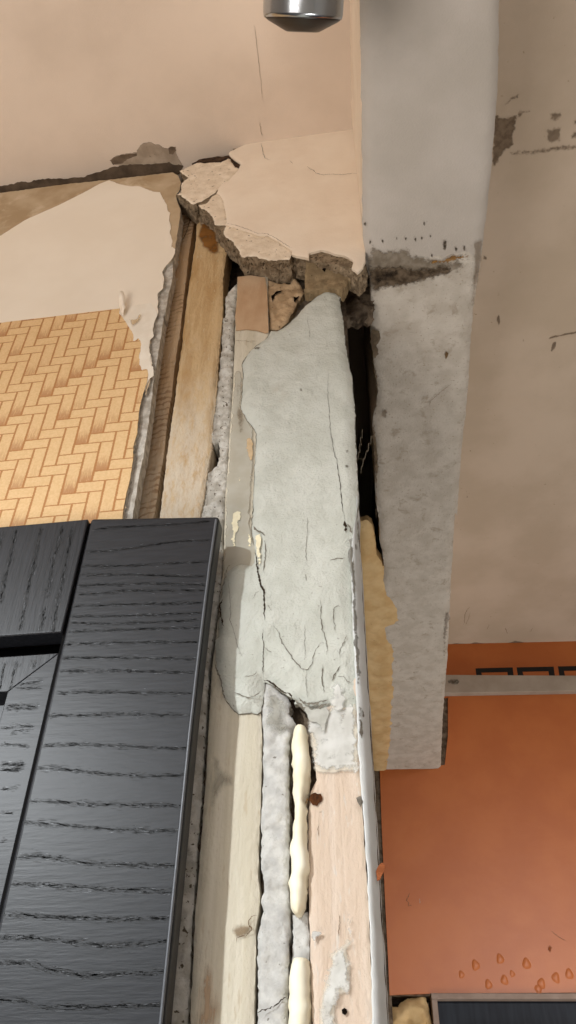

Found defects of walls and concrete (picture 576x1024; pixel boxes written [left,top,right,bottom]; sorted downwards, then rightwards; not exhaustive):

flaking render [110,142,293,264]
water stain [368,222,482,291]
crack [327,376,352,533]
crack [215,517,349,710]